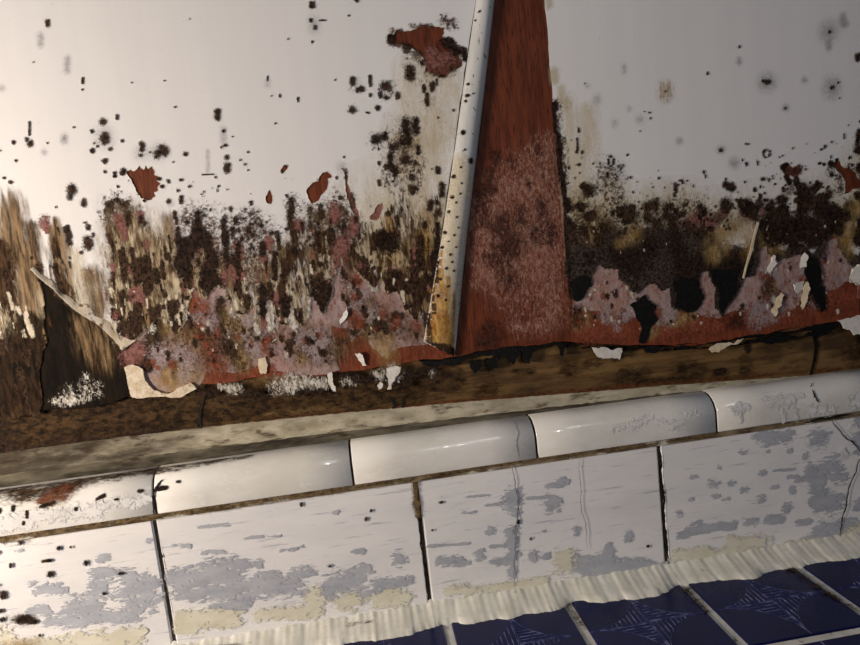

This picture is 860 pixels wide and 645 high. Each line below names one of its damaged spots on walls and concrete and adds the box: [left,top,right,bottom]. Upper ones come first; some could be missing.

peeling [257,357,268,374]
peeling [377,366,401,390]
water stain [0,57,860,453]
peeling [793,281,810,308]
peeling [837,315,860,335]
peeling [849,265,860,285]
crack [805,335,860,535]
peeling [25,543,415,631]
peeling [426,476,570,581]
crack [511,422,519,583]
peeling [571,542,668,577]
peeling [675,427,860,541]